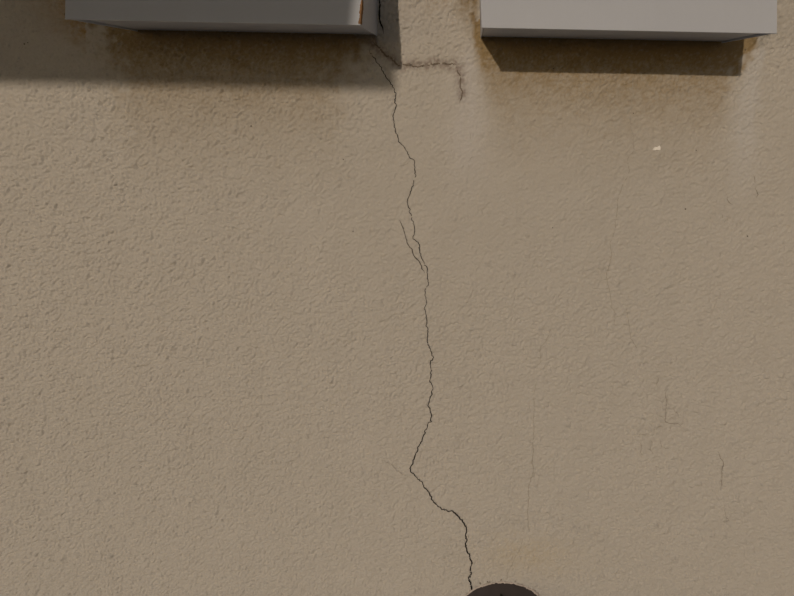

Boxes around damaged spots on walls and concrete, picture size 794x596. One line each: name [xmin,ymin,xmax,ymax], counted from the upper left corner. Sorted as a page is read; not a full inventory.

crack [369,0,473,590]